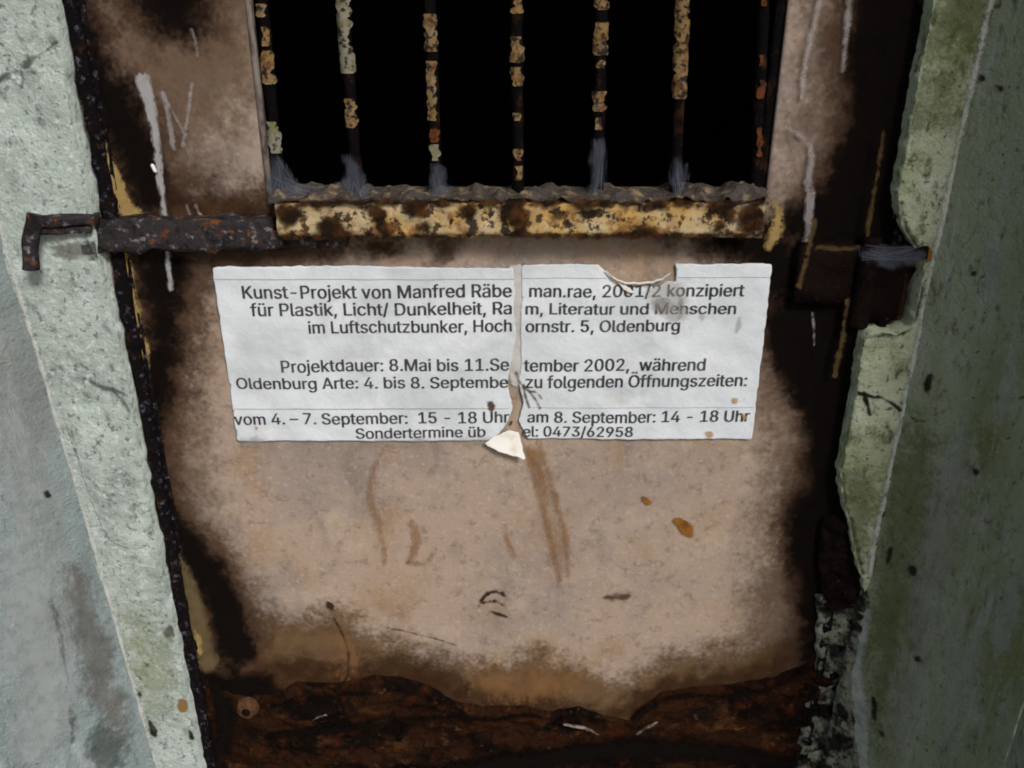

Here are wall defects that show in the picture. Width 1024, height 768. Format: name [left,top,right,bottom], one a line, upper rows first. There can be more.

water stain [136,73,167,216]
rust [89,0,255,196]
rust [149,197,795,298]
water stain [798,133,814,242]
rust [785,0,847,209]
rust [162,394,219,540]
rust [246,326,813,720]
spalling [794,473,870,768]